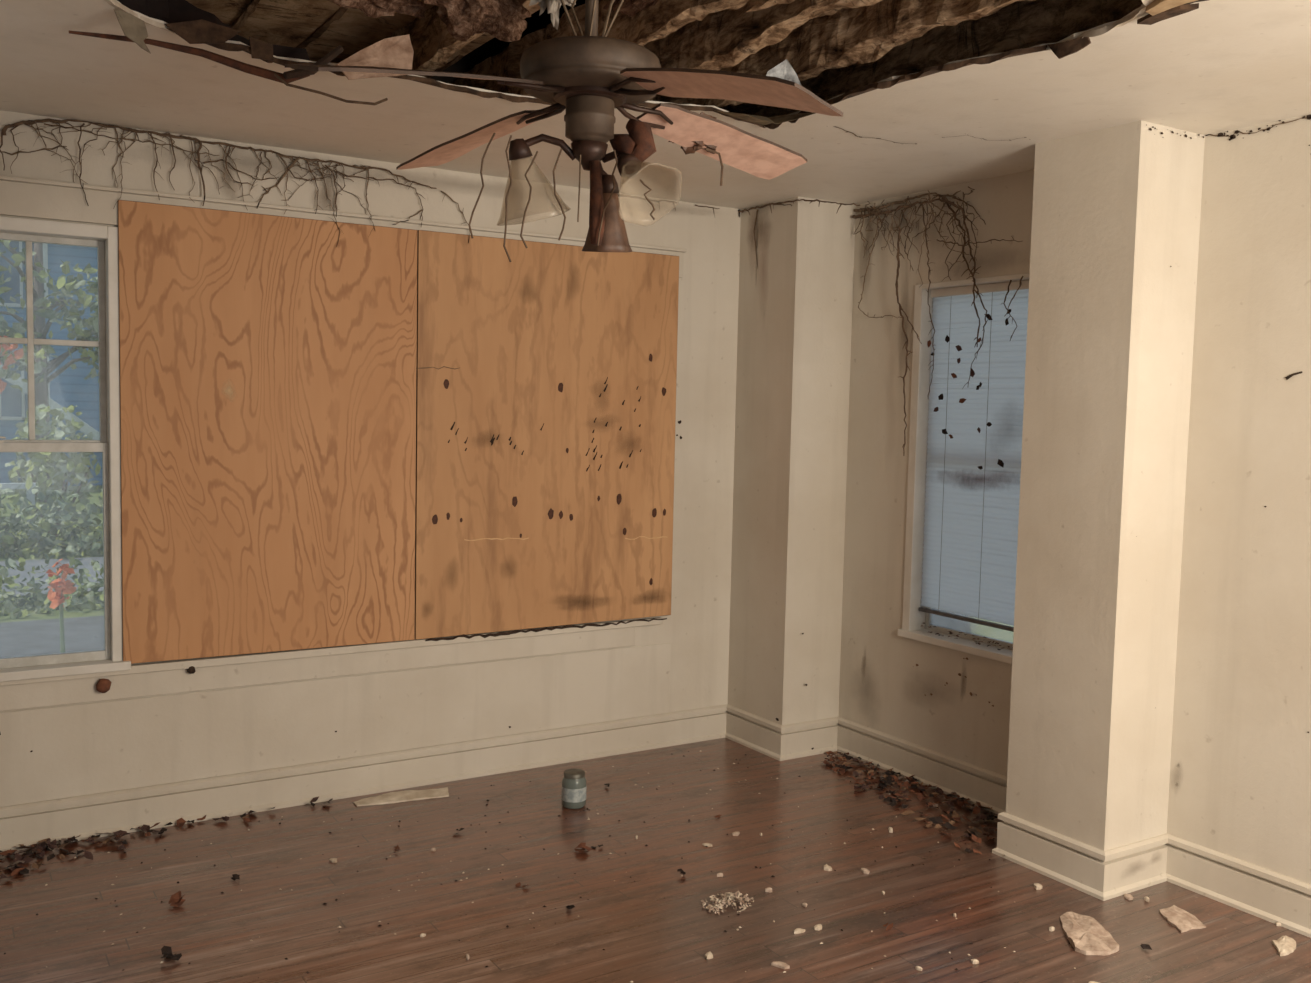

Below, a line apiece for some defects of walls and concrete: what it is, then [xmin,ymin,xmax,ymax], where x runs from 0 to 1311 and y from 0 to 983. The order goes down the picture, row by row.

flaking render [1137,0,1199,25]